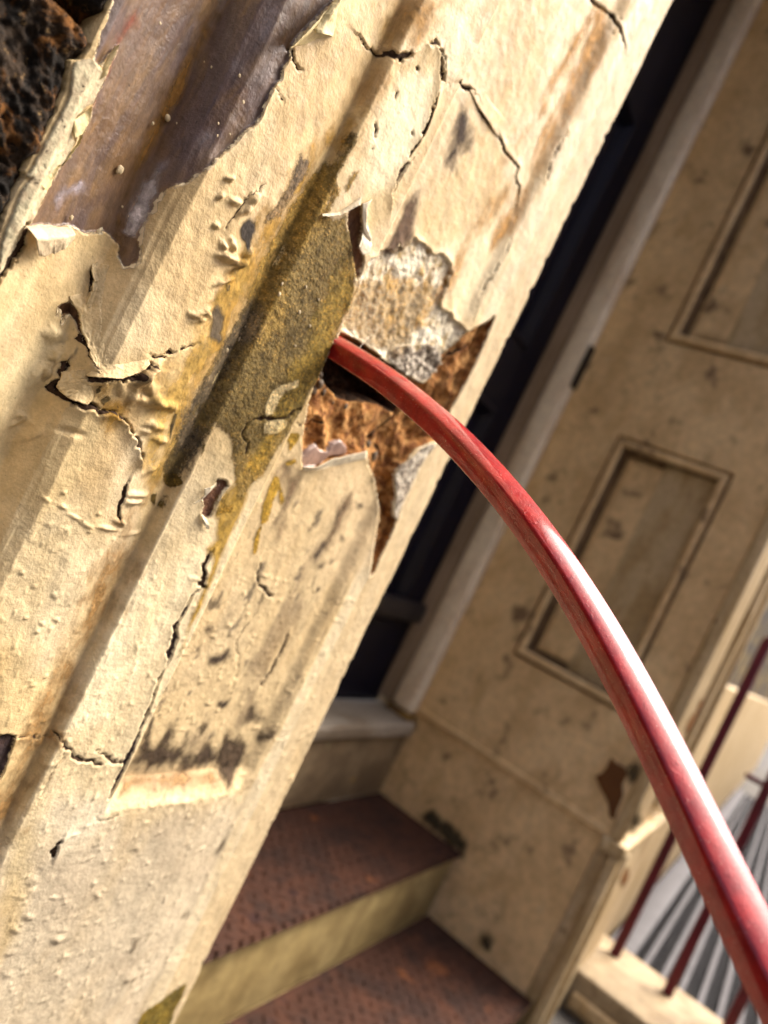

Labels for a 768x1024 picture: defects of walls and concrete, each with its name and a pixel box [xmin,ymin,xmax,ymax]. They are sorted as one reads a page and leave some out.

crack [590,0,625,45]
peeling [0,0,341,273]
crack [360,37,520,202]
water stain [99,387,124,426]
water stain [144,121,359,509]
spalling [301,197,495,578]
peeling [194,479,229,529]
crack [11,552,210,821]
peeling [595,757,627,820]